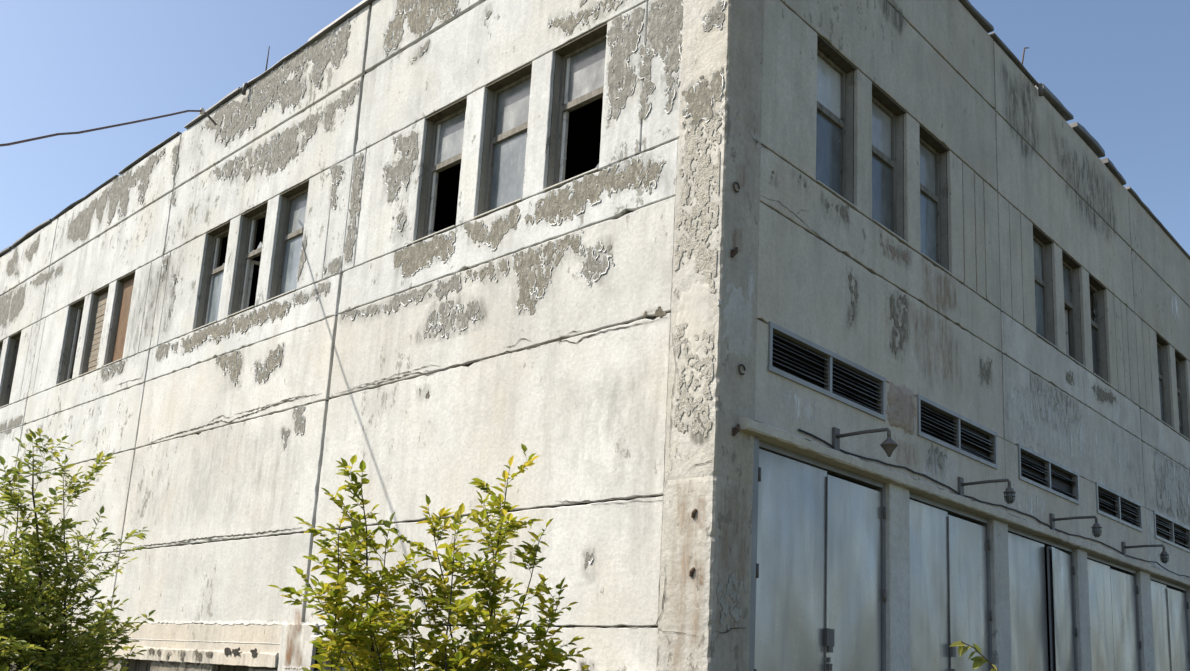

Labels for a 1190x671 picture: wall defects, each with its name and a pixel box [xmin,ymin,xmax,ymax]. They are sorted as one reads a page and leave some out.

peeling [200,18,361,182]
peeling [383,0,460,64]
spalling [548,0,725,293]
peeling [0,234,62,326]
peeling [155,152,363,387]
crack [151,317,712,471]
peeling [341,131,665,338]
spalling [672,321,713,437]
spalling [890,295,908,354]
crack [559,495,662,505]